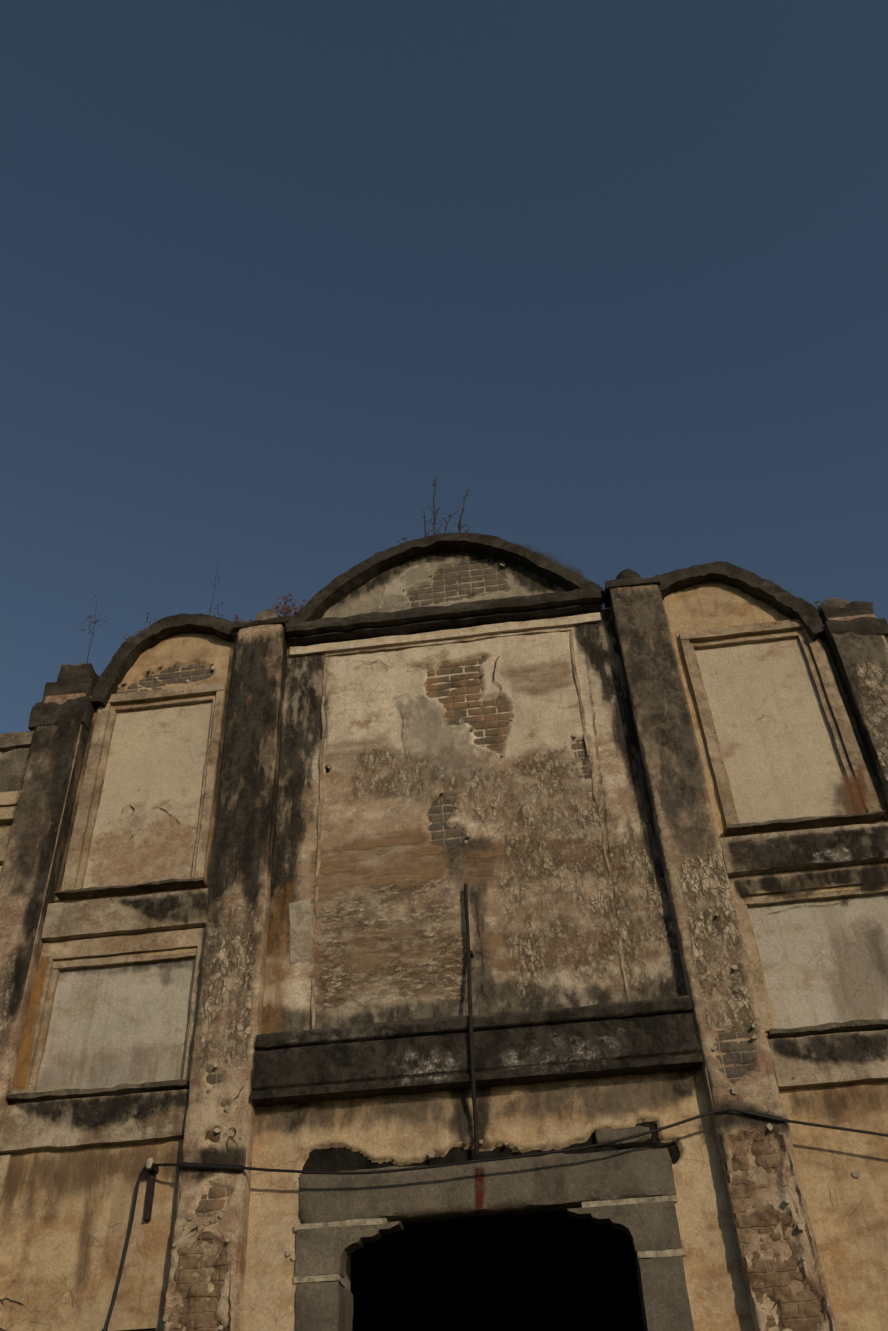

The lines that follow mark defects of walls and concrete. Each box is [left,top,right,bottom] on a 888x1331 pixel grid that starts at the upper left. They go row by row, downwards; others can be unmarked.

spalling [403,559,509,608]
spalling [116,661,217,694]
leakage [121,626,328,985]
leakage [250,587,714,1145]
leakage [729,632,888,903]
spalling [302,1122,680,1174]
crack [0,1298,23,1331]
spalling [163,1187,232,1331]
spalling [726,1123,825,1331]